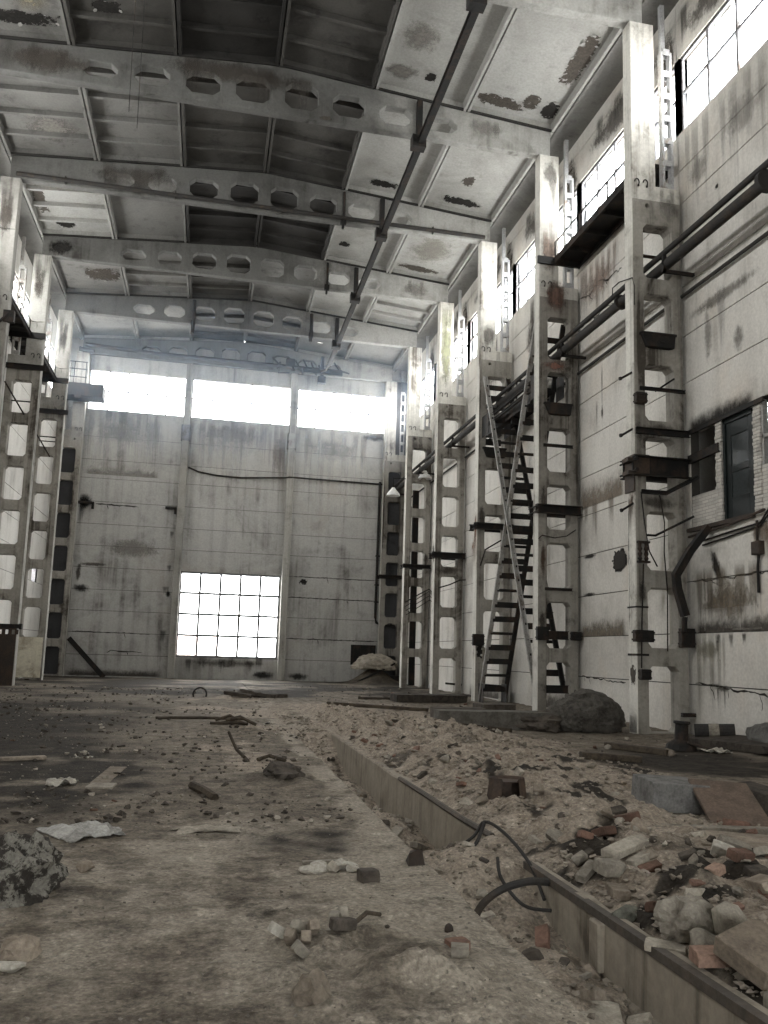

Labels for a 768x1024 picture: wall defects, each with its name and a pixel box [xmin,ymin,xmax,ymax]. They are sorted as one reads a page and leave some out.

peeling [0,9,62,27]
peeling [558,35,601,88]
peeling [478,93,560,119]
peeling [370,179,399,190]
peeling [441,176,482,208]
peeling [85,268,120,282]
water stain [691,397,750,429]
water stain [697,571,768,645]
crack [695,682,768,710]